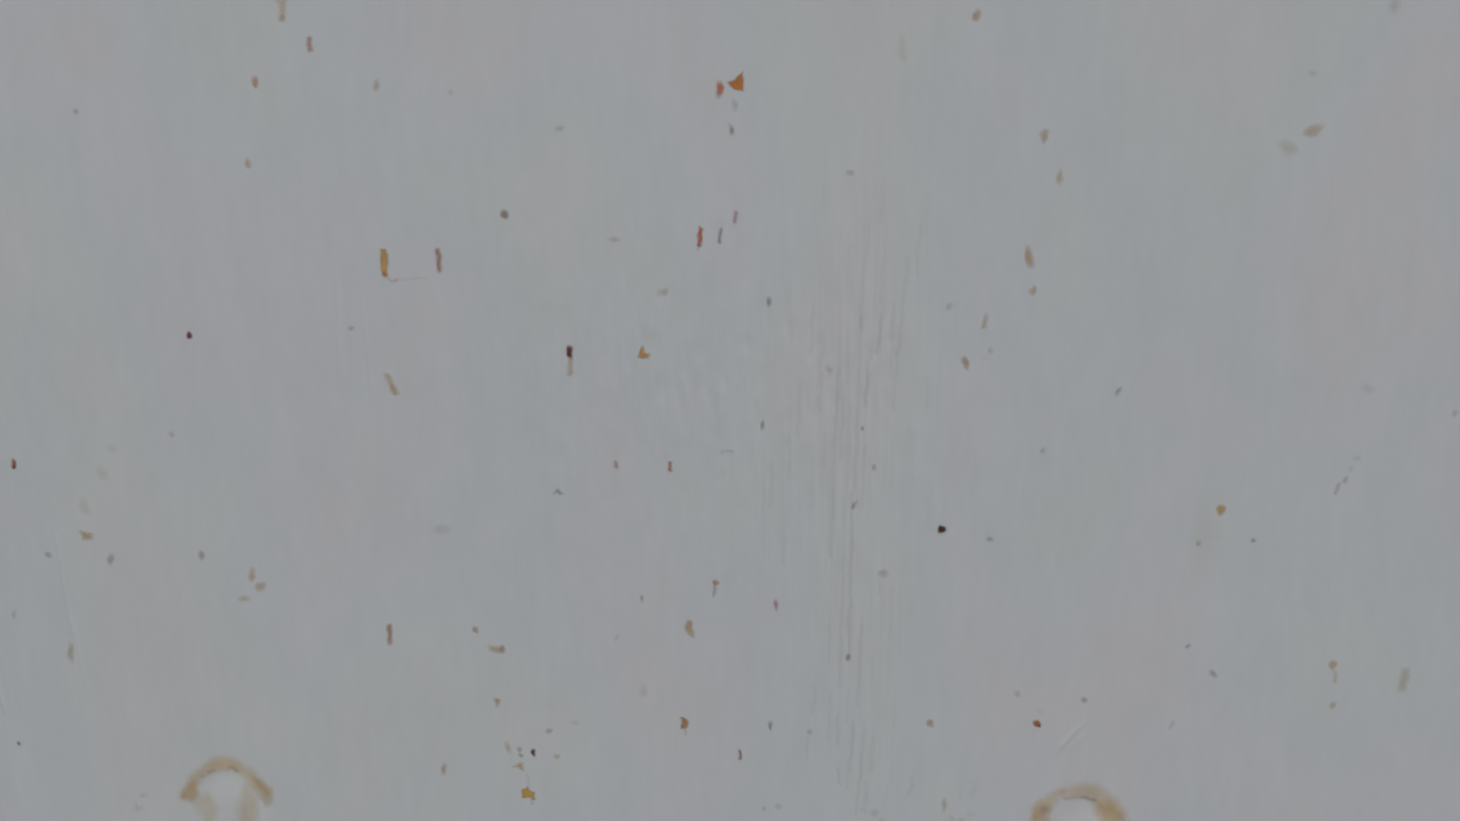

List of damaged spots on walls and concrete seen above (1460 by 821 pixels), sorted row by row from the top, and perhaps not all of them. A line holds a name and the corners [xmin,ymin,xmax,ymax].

corrosion [718,74,743,94]